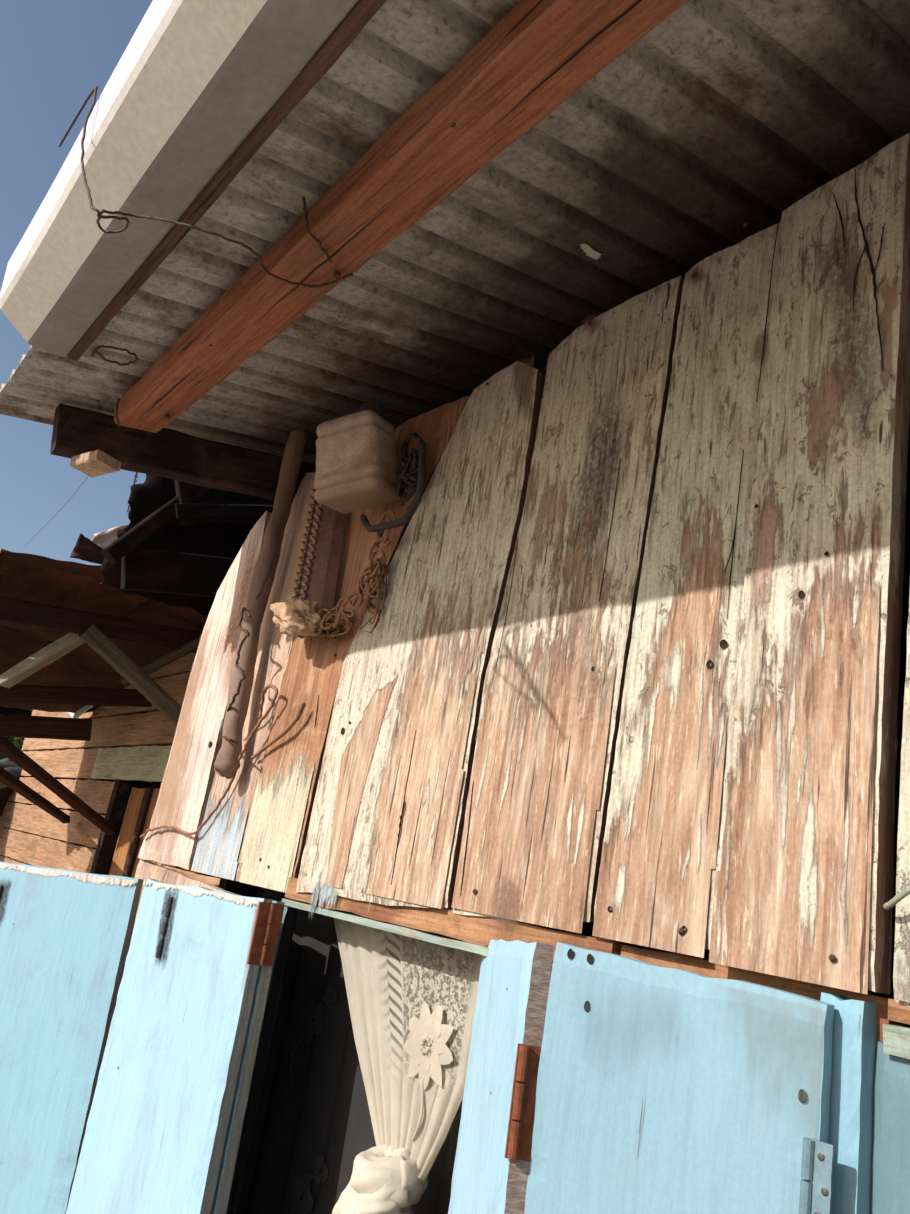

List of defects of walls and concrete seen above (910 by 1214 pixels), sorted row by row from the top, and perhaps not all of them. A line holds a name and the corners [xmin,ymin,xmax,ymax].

crack [833,161,885,371]
peeling [805,336,855,479]
peeling [310,428,882,994]
peeling [0,754,315,907]
peeling [894,934,910,1002]